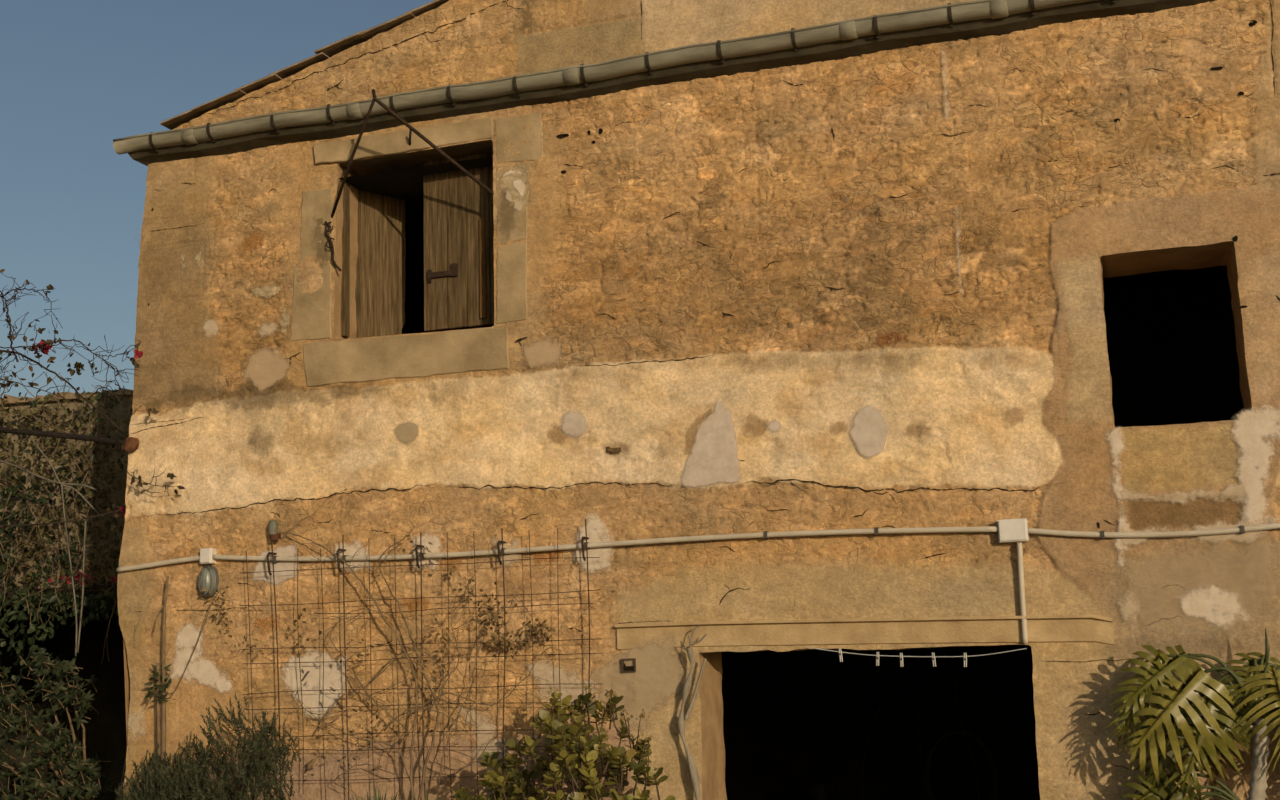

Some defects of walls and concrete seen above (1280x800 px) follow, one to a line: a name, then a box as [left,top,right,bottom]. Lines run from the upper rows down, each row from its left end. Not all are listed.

crack [199,0,522,119]
flaking render [499,167,530,212]
crack [151,482,673,523]